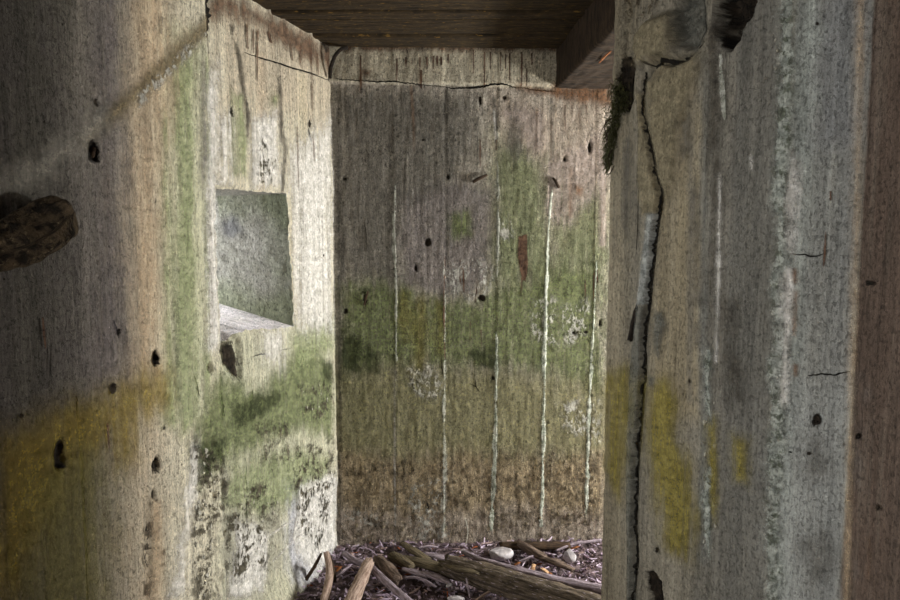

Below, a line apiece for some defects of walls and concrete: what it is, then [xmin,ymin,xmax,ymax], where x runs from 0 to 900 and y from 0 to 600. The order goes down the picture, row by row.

crack [245,52,555,92]
damp [707,26,739,150]
spalling [720,0,758,49]
damp [408,436,447,540]
damp [443,161,513,340]
damp [489,332,499,531]
rust [518,234,528,295]
damp [532,138,606,528]
crack [630,45,702,599]
crack [808,369,850,377]